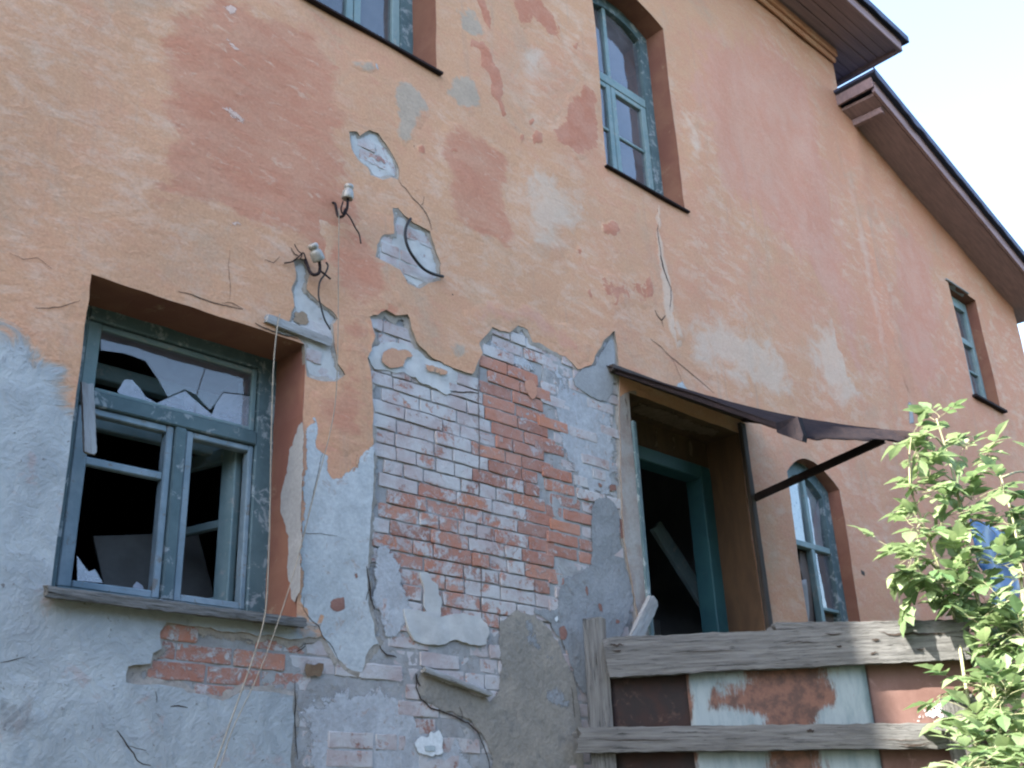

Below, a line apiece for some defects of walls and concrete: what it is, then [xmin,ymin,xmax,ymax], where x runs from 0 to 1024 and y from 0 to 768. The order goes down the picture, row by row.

flaking render [349,77,429,180]
peeling [446,0,602,261]
crack [178,256,298,339]
flaking render [275,259,344,382]
flaking render [376,208,440,289]
crack [651,209,713,392]
flaking render [0,311,646,768]